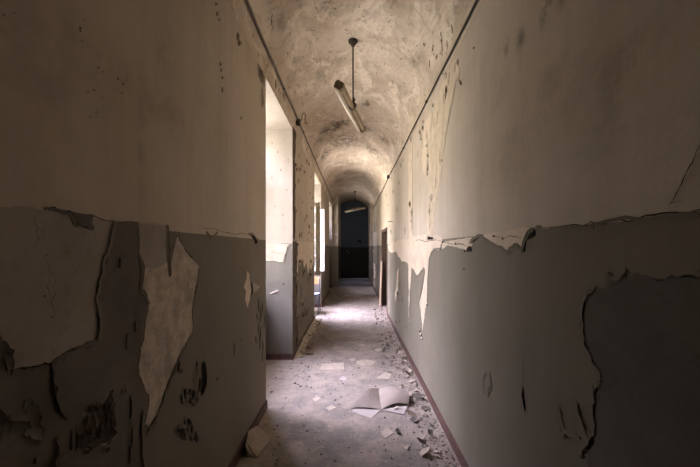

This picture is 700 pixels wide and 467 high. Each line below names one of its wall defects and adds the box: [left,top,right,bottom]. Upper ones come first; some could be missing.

peeling [0,206,201,467]
flaking render [178,361,220,442]
flaking render [204,127,314,362]
peeling [388,58,540,339]
crack [536,145,700,232]
peeling [578,267,700,467]